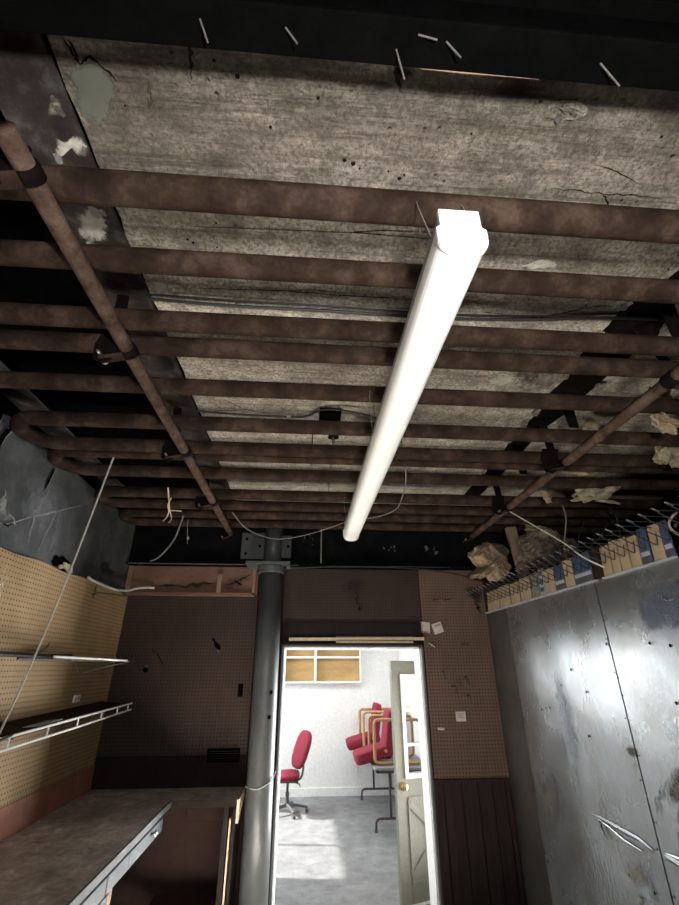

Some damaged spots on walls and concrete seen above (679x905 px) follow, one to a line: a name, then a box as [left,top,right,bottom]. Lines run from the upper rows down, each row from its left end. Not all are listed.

crack [62,38,116,81]
peeling [52,137,87,165]
peeling [79,206,108,244]